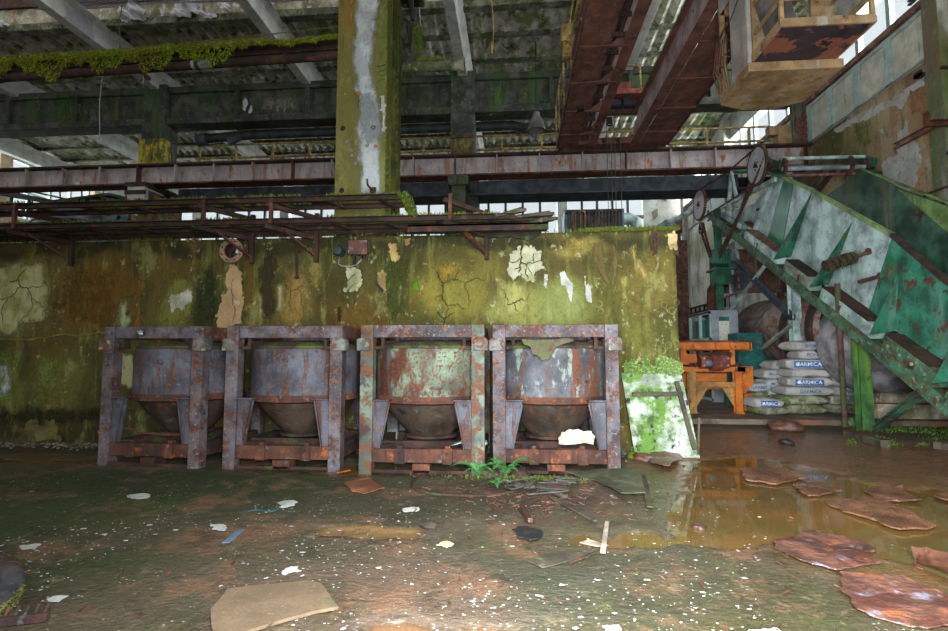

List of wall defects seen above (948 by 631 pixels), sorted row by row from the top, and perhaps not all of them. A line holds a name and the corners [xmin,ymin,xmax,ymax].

peeling [379,95,387,132]
crack [0,271,47,324]
peeling [168,289,192,313]
flaking render [215,264,244,328]
leakage [258,255,277,318]
flaking render [507,245,548,286]
leakage [0,365,100,424]